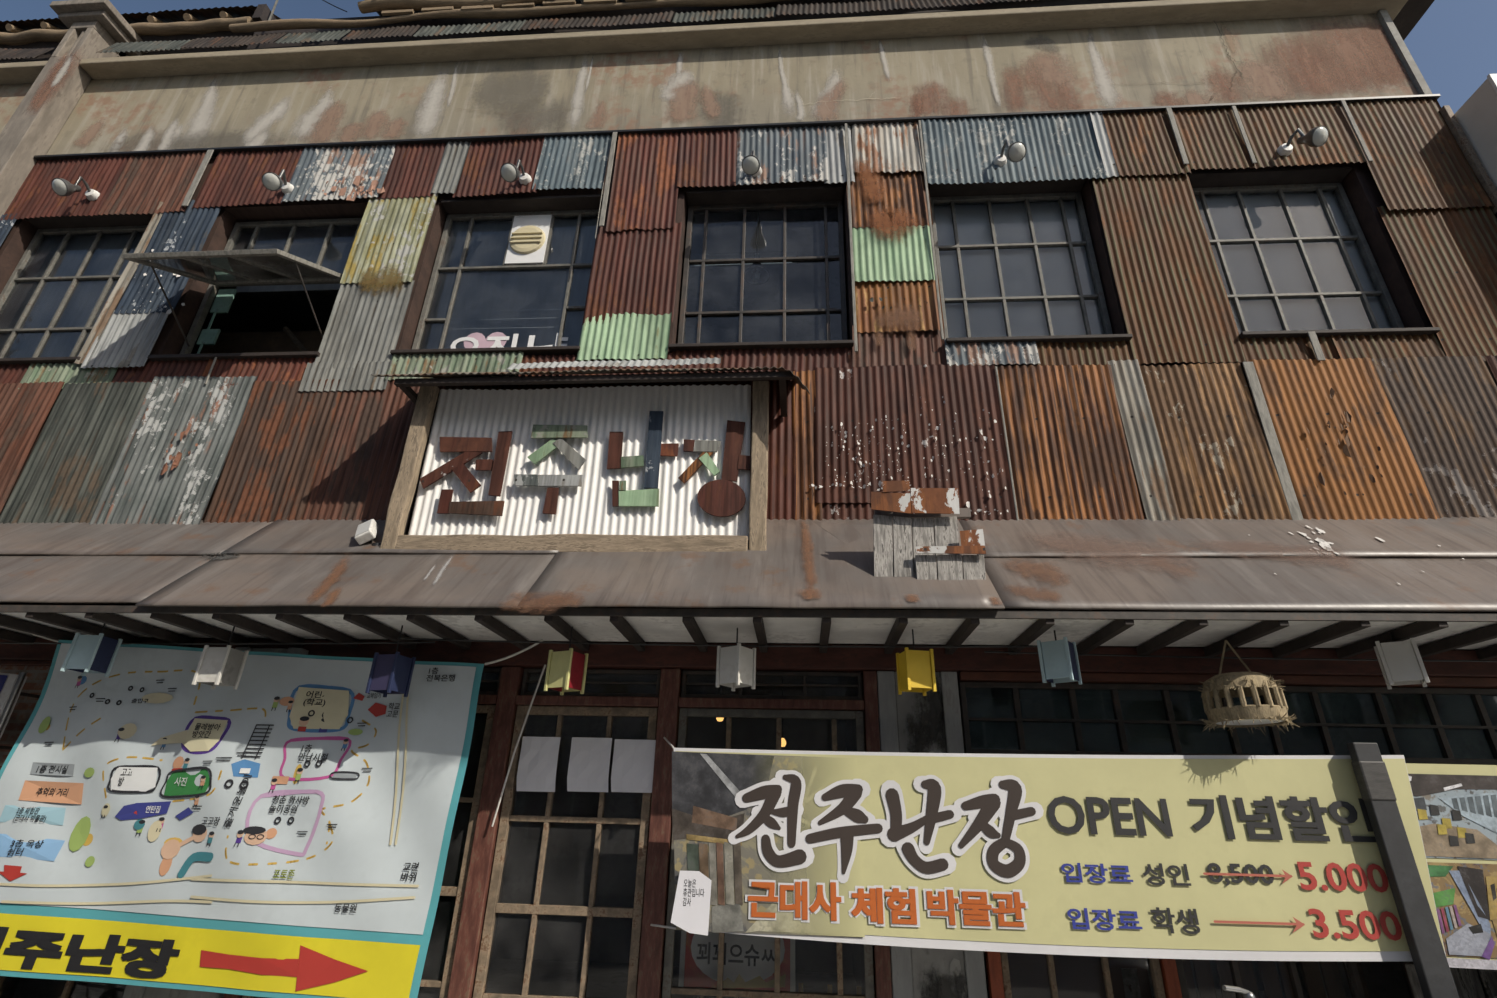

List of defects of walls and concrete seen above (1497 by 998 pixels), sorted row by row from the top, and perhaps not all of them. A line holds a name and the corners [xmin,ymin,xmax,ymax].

rust [669,81,720,121]
rust [858,160,918,238]
peeling [809,396,1008,515]
peeling [1289,525,1339,556]